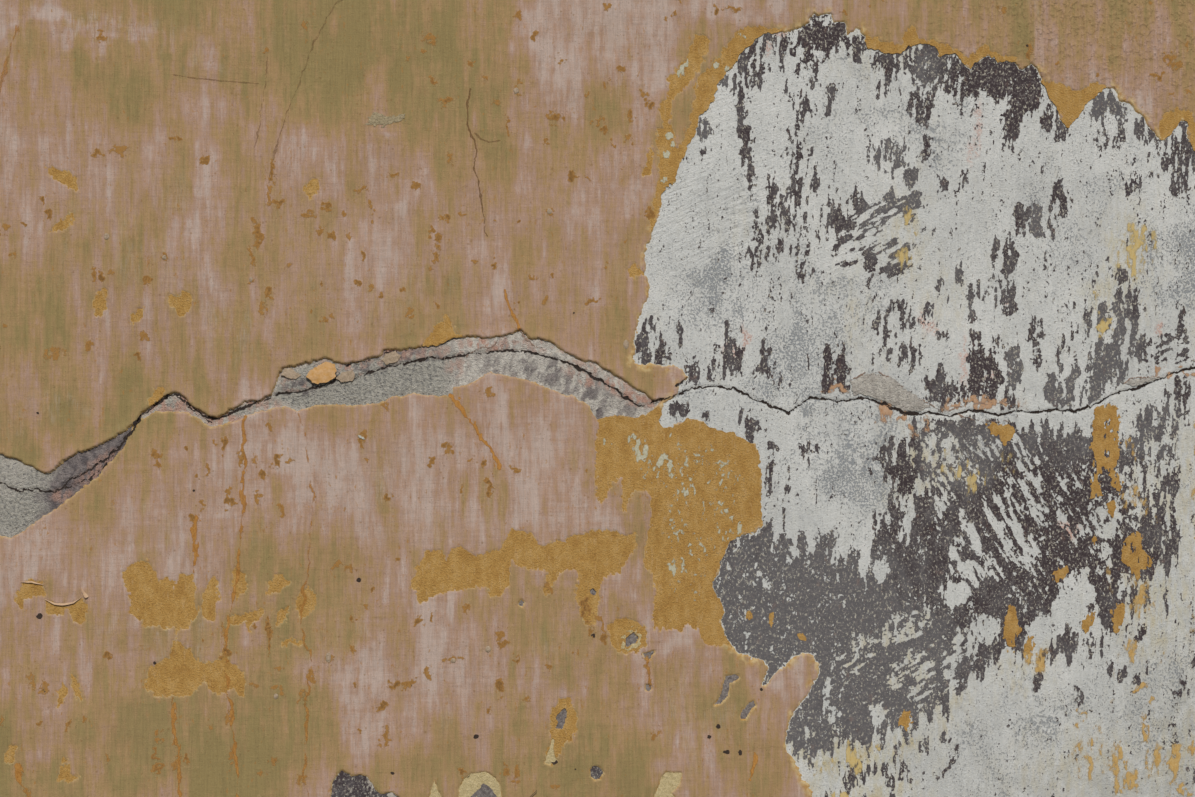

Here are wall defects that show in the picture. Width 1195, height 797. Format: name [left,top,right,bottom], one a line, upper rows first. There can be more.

crack [0,328,1195,493]
peeling [628,13,1195,797]
peeling [141,314,763,648]
peeling [14,579,89,624]
peeling [122,561,316,697]
peeling [607,617,654,659]
peeling [545,697,578,767]
peeling [331,770,398,797]
peeling [459,772,502,797]
peeling [590,766,603,779]